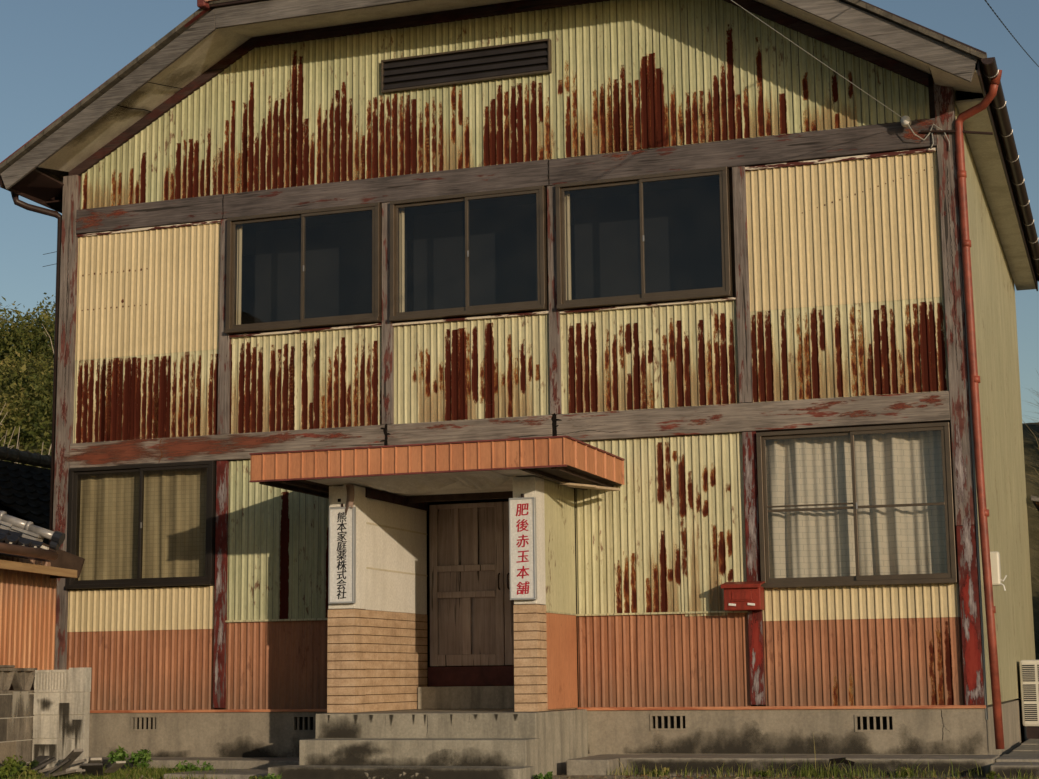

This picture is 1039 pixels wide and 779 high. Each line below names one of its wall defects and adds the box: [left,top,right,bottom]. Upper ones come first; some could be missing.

rust [164,50,470,200]
rust [483,24,787,166]
rust [76,337,382,443]
rust [412,323,540,421]
rust [568,313,736,413]
rust [751,301,947,402]
peeling [791,395,943,417]
peeling [215,550,223,697]
rust [616,442,733,613]
peeling [744,437,757,576]
peeling [749,611,764,706]
peeling [954,425,983,705]